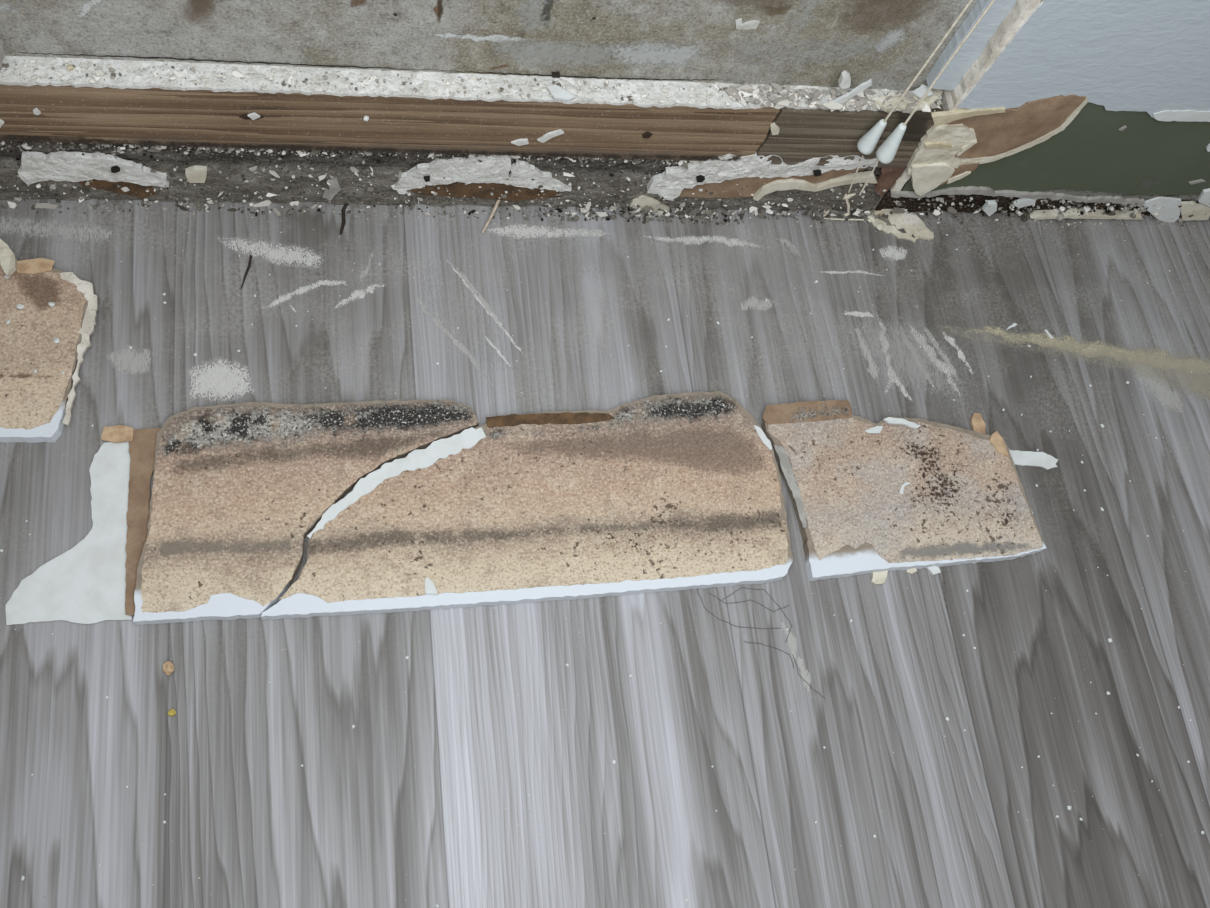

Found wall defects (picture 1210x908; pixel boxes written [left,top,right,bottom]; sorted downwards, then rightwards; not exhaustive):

peeling [1153,110,1210,122]
spalling [185,165,207,183]
spalling [1014,198,1036,208]